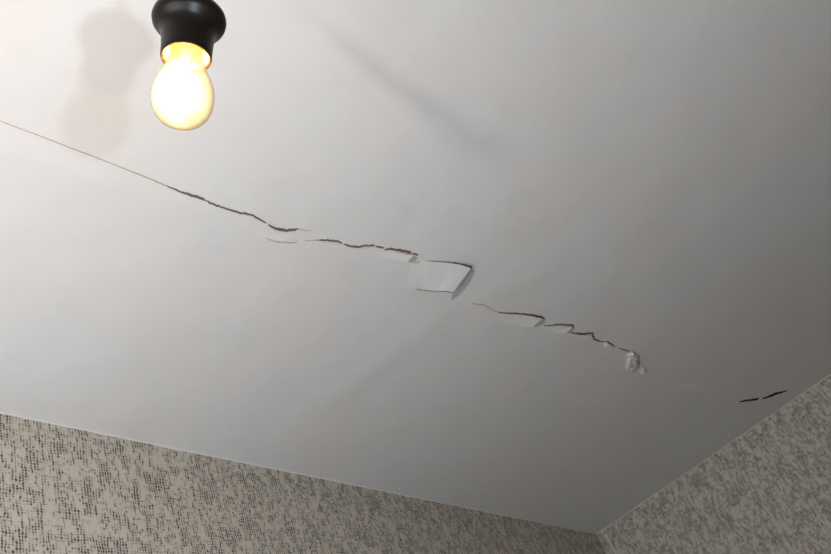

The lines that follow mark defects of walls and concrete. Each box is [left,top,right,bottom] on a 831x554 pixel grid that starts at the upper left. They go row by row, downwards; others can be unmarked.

crack [472,303,630,352]
crack [737,389,797,404]